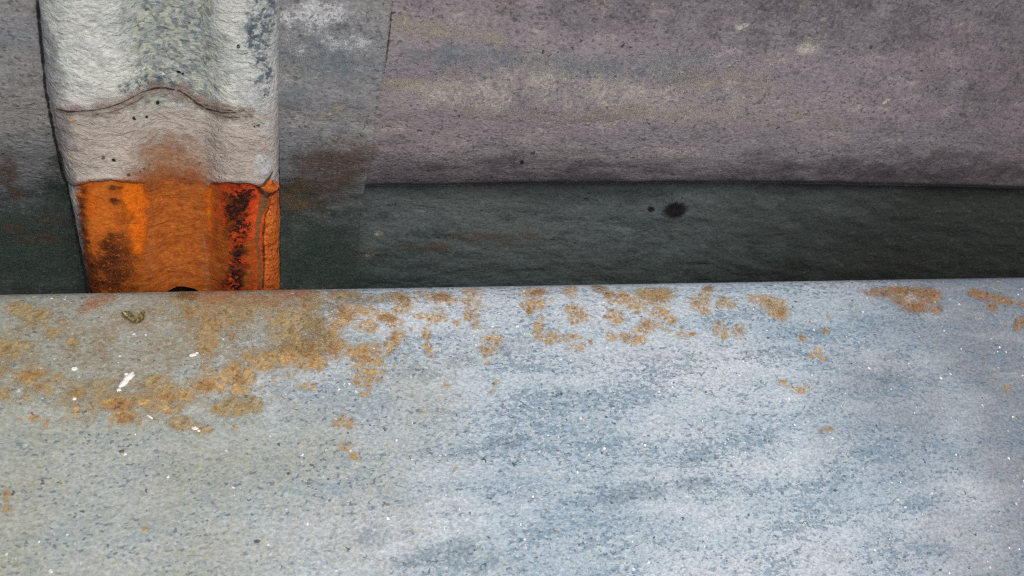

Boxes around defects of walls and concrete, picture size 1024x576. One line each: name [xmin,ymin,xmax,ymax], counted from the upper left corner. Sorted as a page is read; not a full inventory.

corrosion [0,142,480,434]
corrosion [520,287,593,350]
corrosion [593,286,695,344]
corrosion [691,287,741,339]
corrosion [750,295,787,320]
corrosion [864,286,940,314]
corrosion [970,289,1024,311]
corrosion [481,333,502,365]